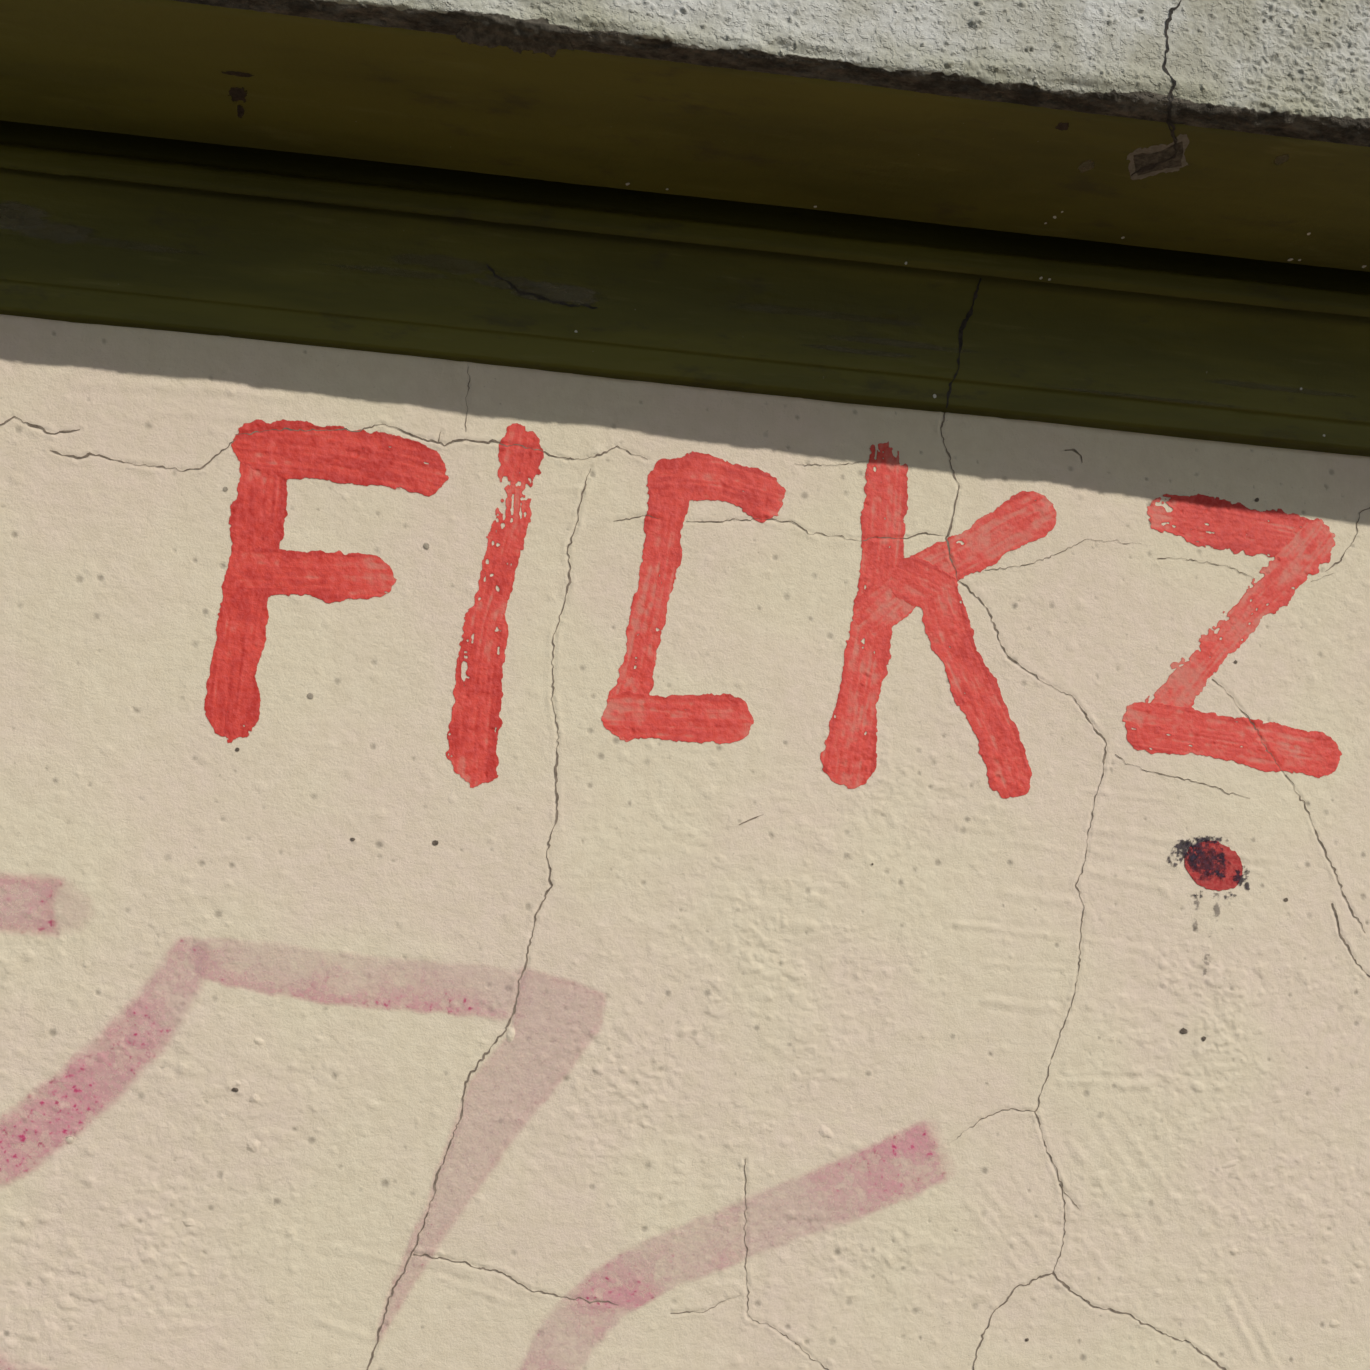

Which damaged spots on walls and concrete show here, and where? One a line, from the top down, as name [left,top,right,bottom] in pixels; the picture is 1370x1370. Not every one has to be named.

spalling [1126,134,1190,180]
crack [1162,0,1181,157]
crack [1311,508,1370,582]
crack [0,370,647,1370]
crack [616,278,1254,1370]
crack [1212,679,1370,977]